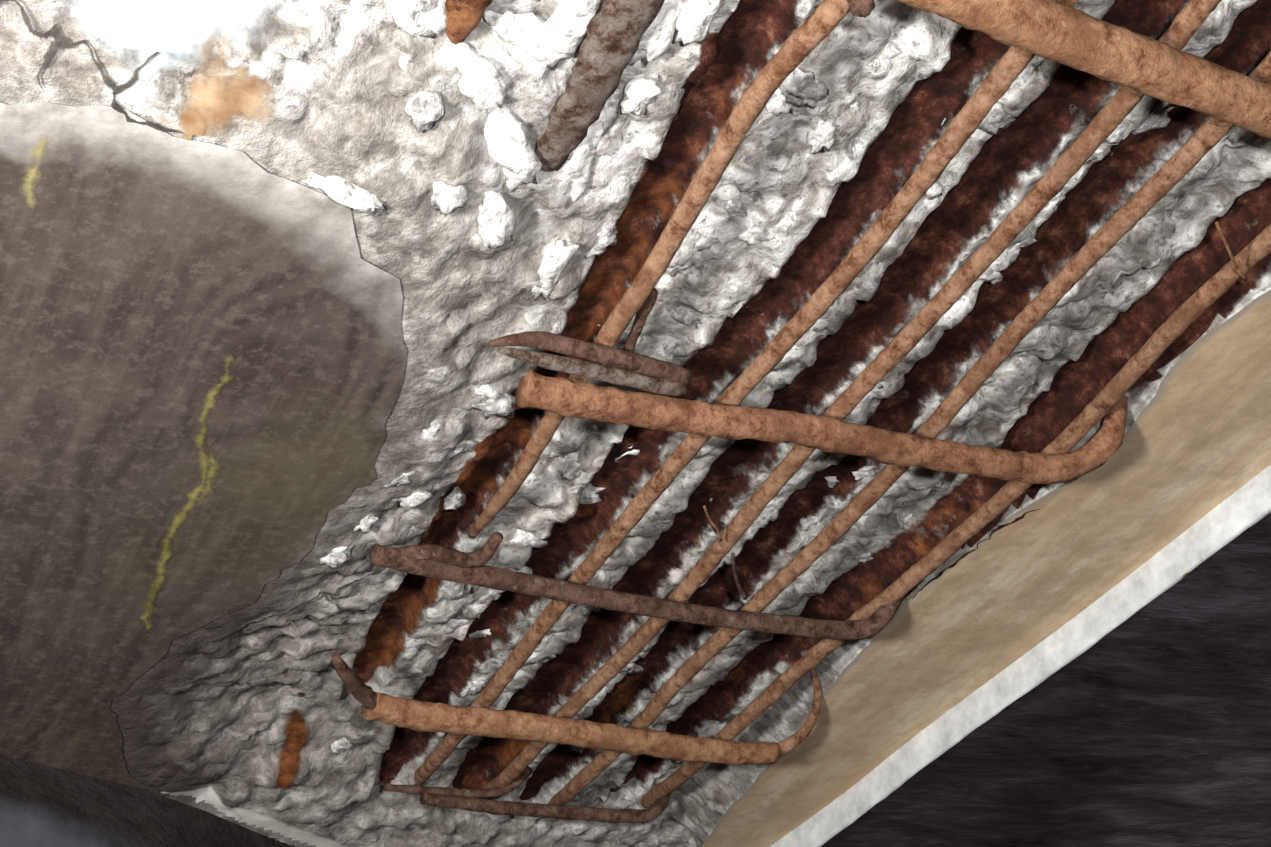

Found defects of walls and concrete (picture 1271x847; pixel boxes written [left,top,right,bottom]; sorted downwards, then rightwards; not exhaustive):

leakage [24,141,45,205]
crack [0,0,185,135]
leakage [141,358,232,628]
spalling [0,0,774,847]
rust [561,0,797,343]
spalling [592,0,962,367]
spalling [651,443,968,616]
rust [659,27,1011,401]
spalling [698,46,1062,408]
rust [767,64,1210,433]
spalling [806,85,1271,455]
rust [998,178,1271,453]